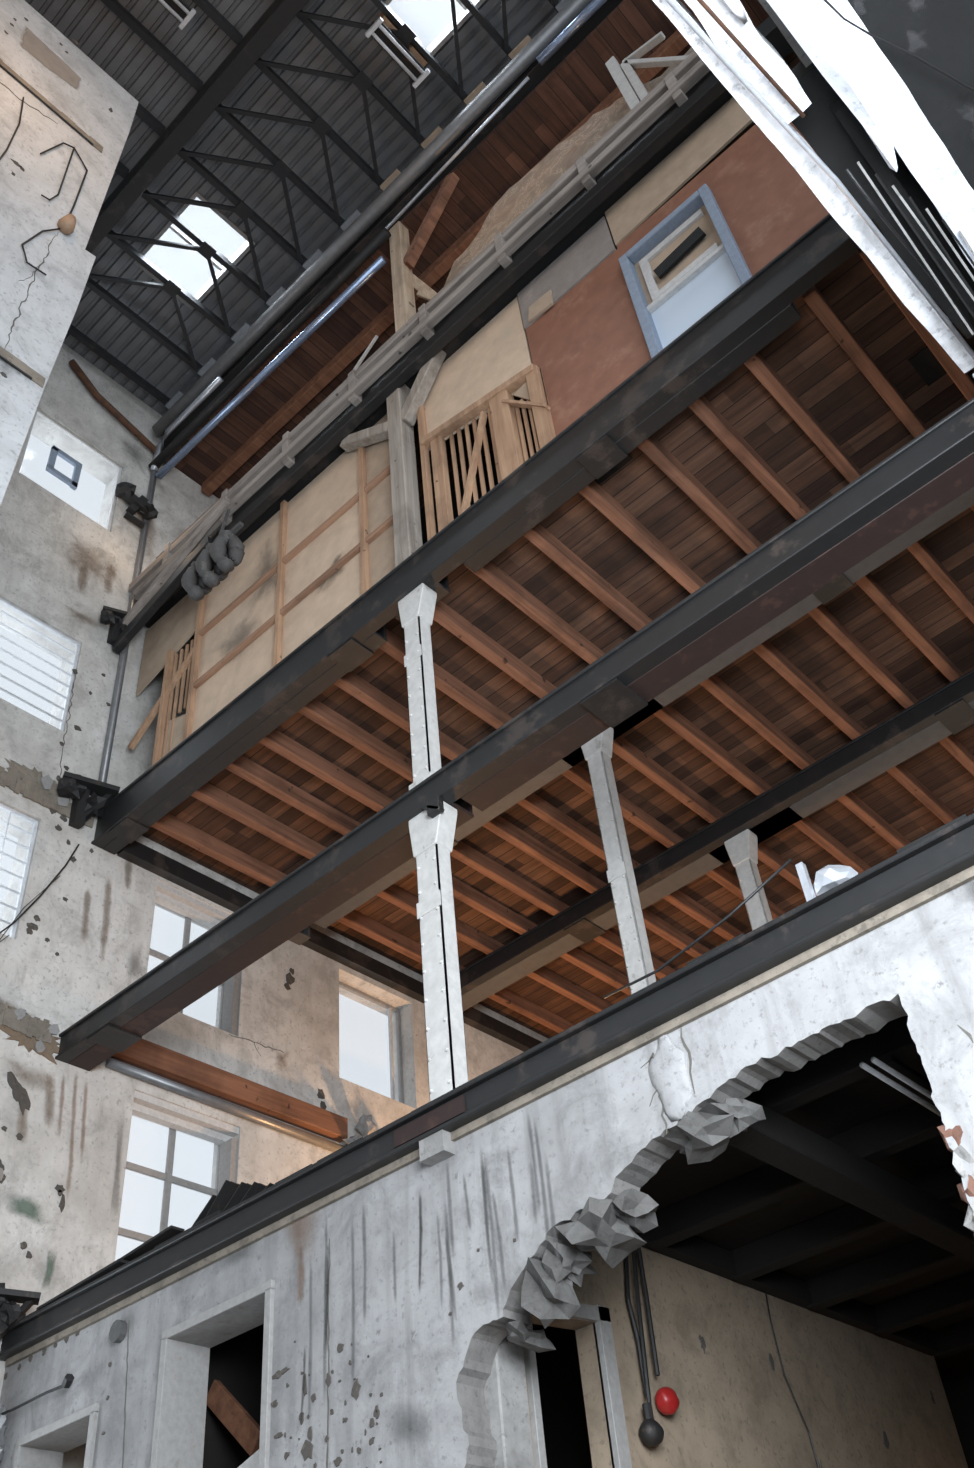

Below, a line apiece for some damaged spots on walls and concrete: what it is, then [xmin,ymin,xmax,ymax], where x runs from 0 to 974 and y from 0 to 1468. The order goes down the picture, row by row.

spalling [7,1071,31,1115]
spalling [663,1098,766,1164]
spalling [937,1125,974,1232]
spalling [506,1188,659,1353]